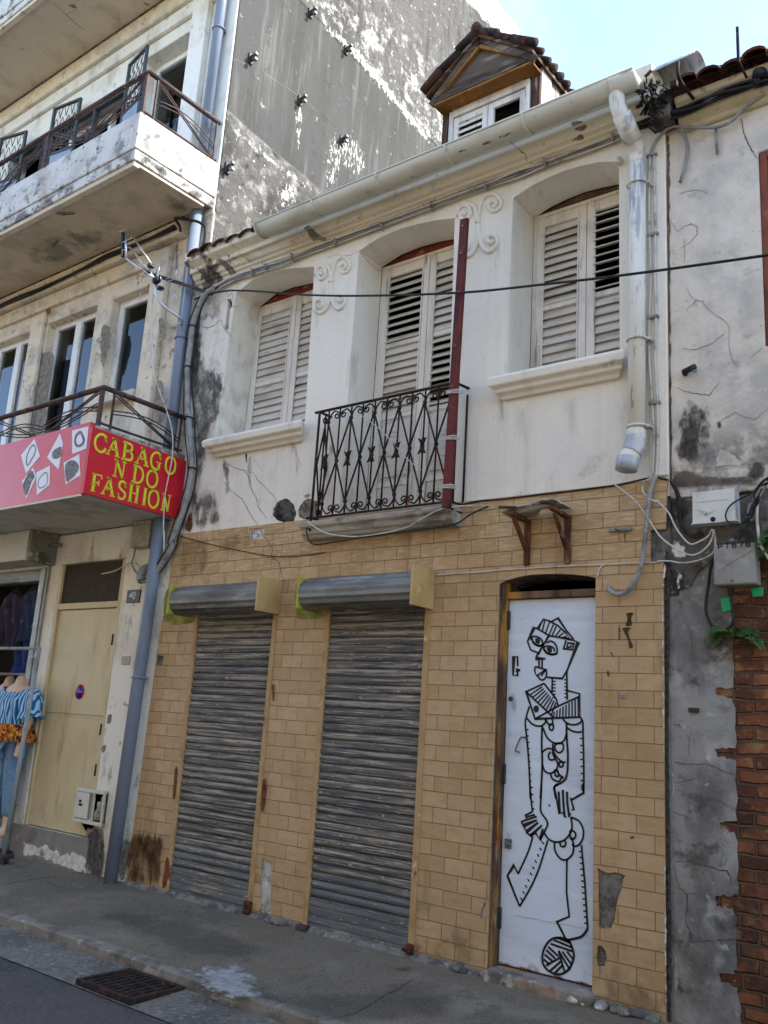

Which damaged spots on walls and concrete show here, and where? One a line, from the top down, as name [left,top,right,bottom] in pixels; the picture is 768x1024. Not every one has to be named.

damp [326,130,366,191]
crack [670,221,698,262]
damp [198,266,223,285]
crack [682,291,762,367]
damp [192,332,222,471]
damp [193,493,219,526]
crack [224,459,284,581]
damp [662,406,768,596]
peeling [23,842,87,873]
spalling [598,868,625,929]
spalling [598,946,607,966]